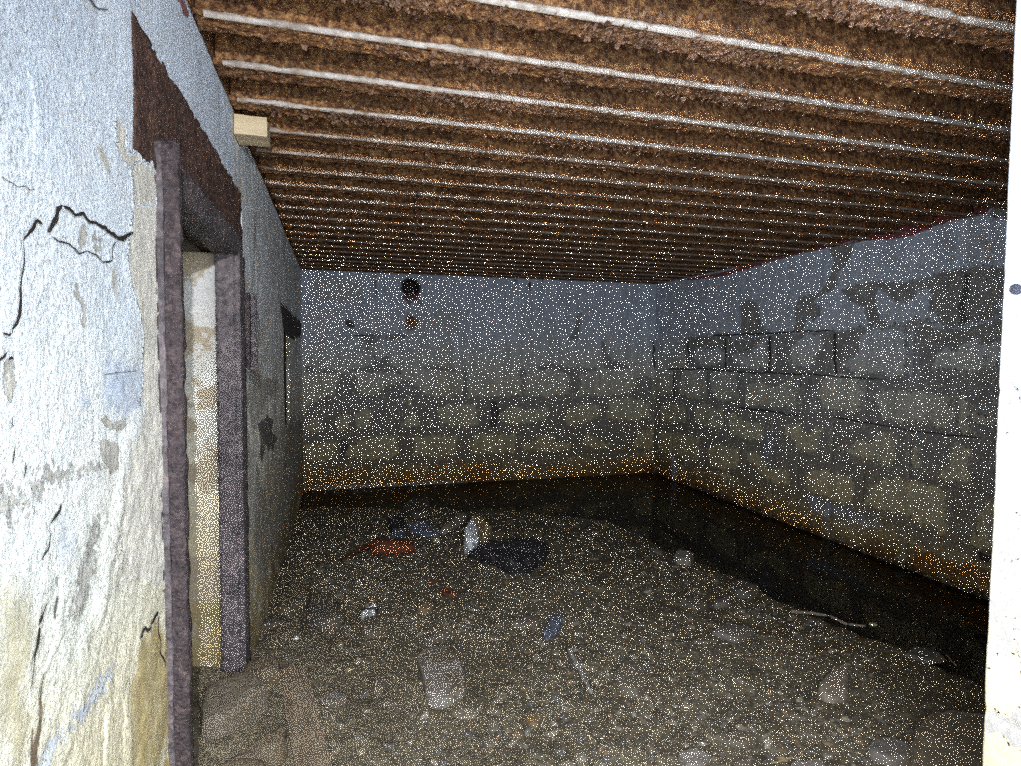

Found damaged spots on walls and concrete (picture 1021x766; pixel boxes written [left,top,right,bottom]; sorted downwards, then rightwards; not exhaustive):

crack [0,205,134,361]
peeling [0,107,165,596]
peeling [987,207,1019,250]
peeling [247,240,1021,692]
water stain [633,456,987,604]
crack [31,503,62,766]
peeling [984,703,1021,751]